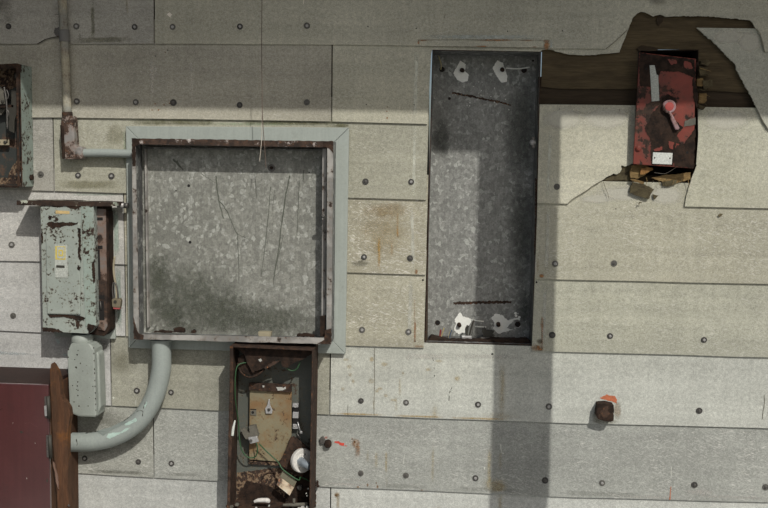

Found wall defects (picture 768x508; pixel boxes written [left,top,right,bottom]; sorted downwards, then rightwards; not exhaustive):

spalling [637,45,713,130]
spalling [603,164,693,199]